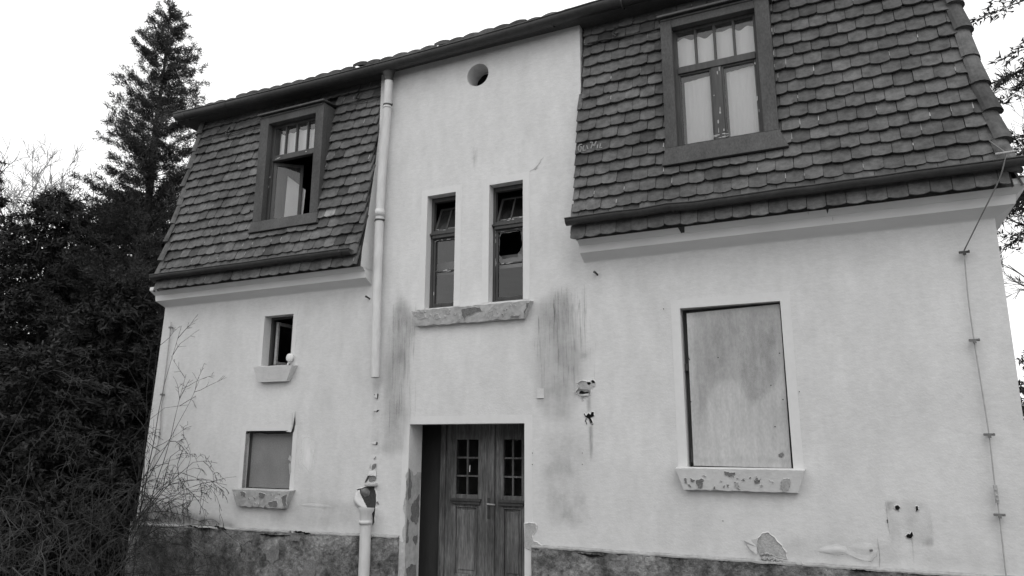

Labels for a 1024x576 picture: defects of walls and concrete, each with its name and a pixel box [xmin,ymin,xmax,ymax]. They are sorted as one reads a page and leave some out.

peeling [232,414,295,508]
flaking render [353,442,379,526]
flaking render [399,468,421,576]
peeling [684,471,791,491]
flaking render [744,531,788,566]